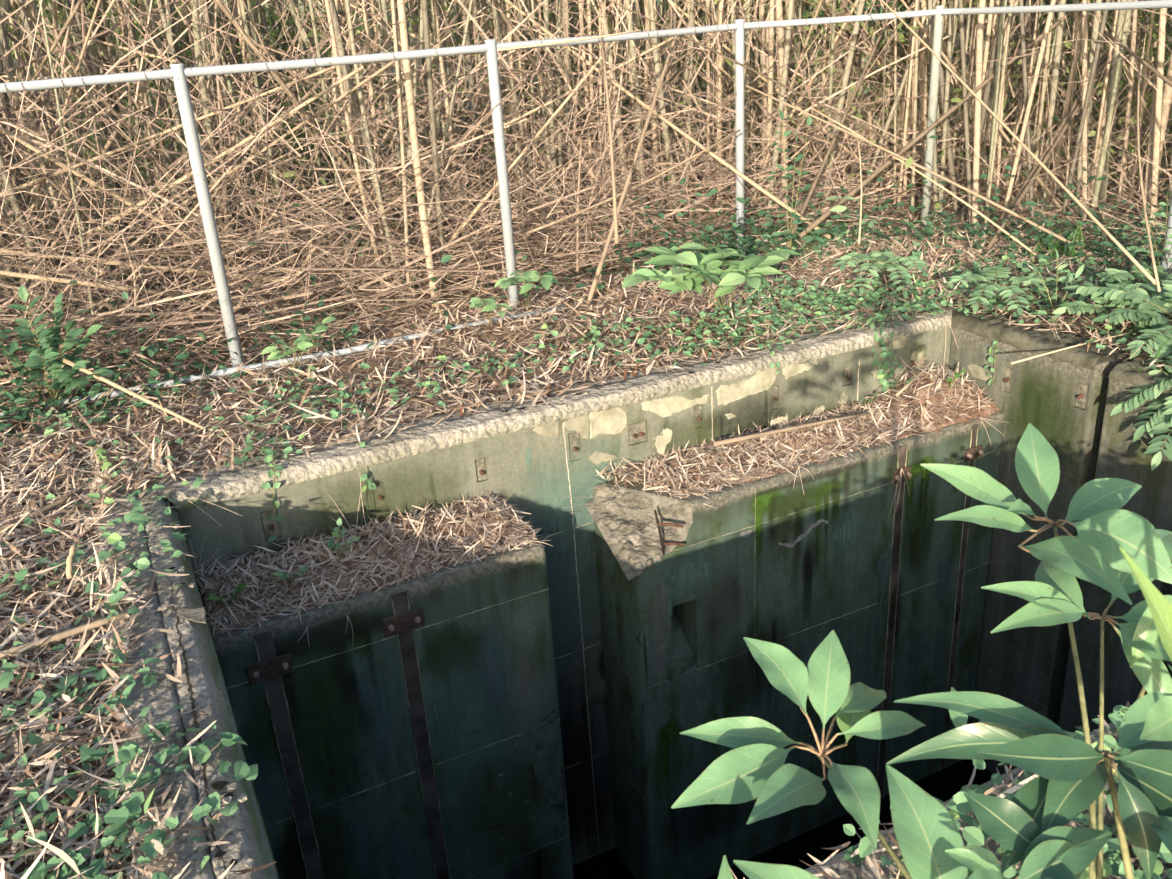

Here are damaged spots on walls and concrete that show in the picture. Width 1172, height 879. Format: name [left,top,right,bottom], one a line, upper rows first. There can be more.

spalling [95,299,1172,879]